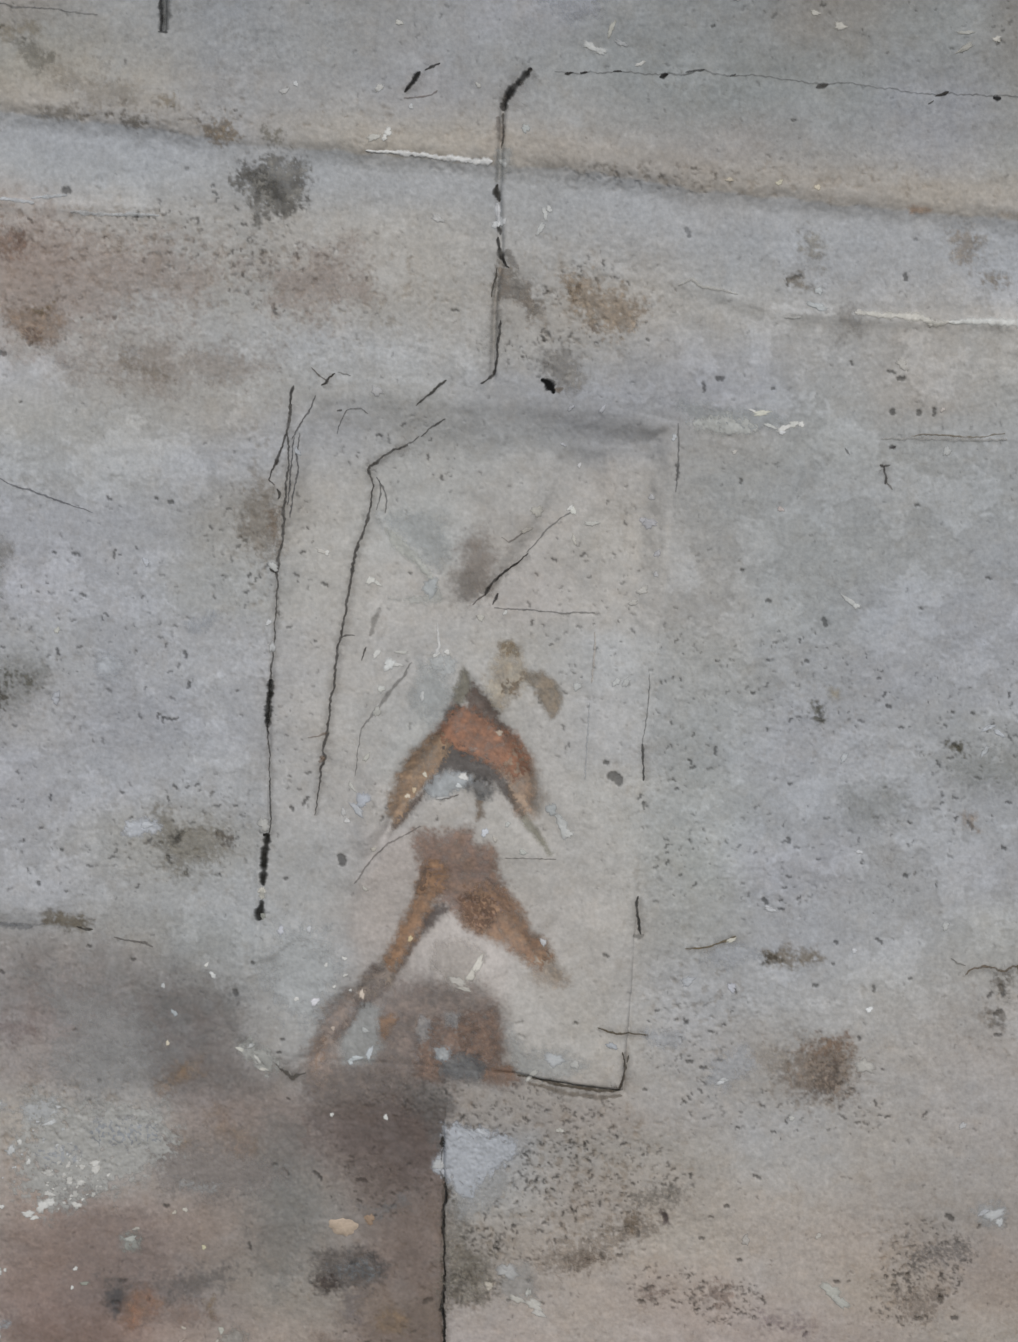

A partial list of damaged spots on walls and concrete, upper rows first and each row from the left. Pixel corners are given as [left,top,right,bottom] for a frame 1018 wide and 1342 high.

crack [158,0,171,33]
crack [404,63,440,98]
crack [497,67,532,147]
crack [481,184,514,384]
crack [255,367,367,920]
crack [315,380,446,814]
rust [388,642,561,824]
crack [475,512,594,614]
leakage [235,1037,280,1078]
leakage [261,925,418,1065]
rust [358,829,562,1083]
crack [440,1136,448,1342]